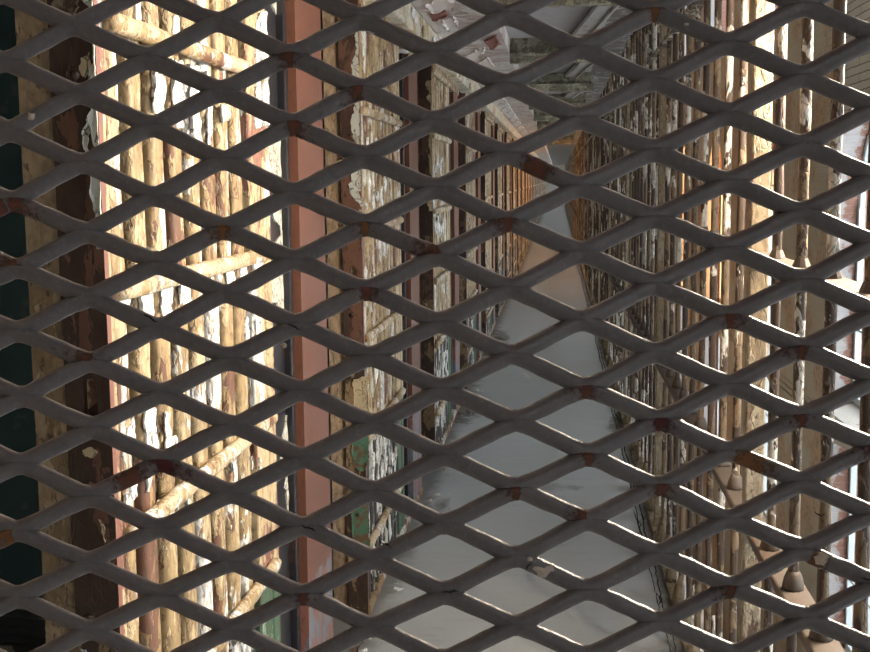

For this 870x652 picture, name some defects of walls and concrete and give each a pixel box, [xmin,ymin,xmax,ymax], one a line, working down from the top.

peeling [255,3,277,35]
peeling [411,0,458,42]
peeling [254,48,268,63]
peeling [151,71,200,114]
peeling [254,81,270,104]
peeling [174,104,231,145]
peeling [254,117,270,129]
corrosion [520,154,555,184]
peeling [244,316,262,341]
peeling [125,408,178,449]
corrosion [113,459,193,491]
corrosion [733,450,774,475]